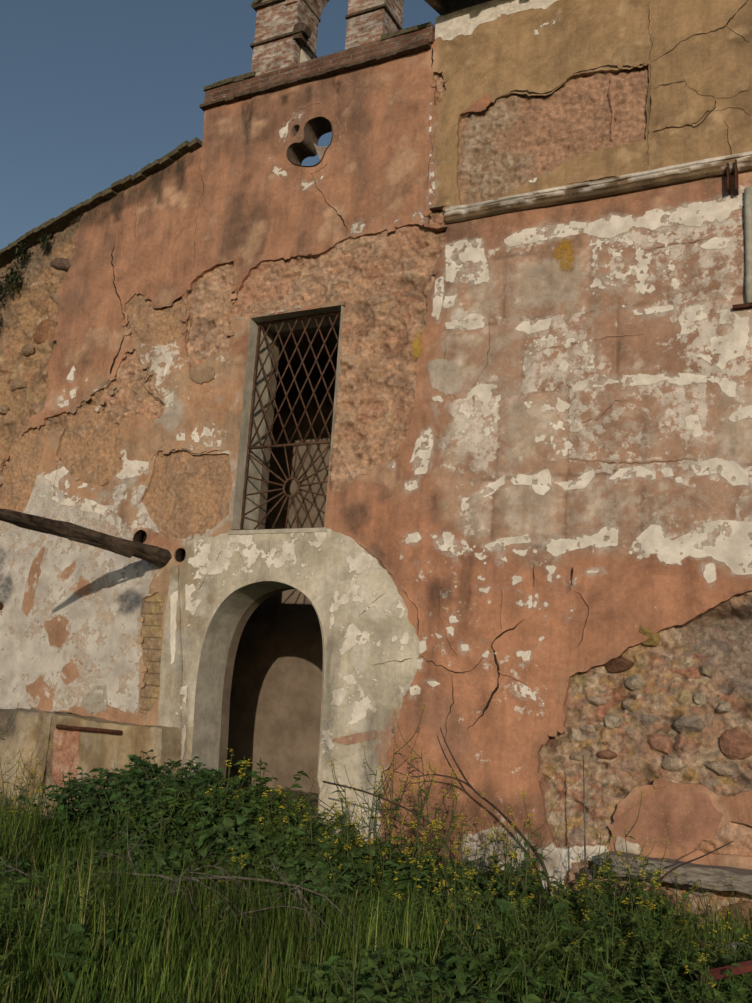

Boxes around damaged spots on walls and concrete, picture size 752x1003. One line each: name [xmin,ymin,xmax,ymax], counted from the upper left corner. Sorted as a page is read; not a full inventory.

crack [502,0,751,171]
crack [567,174,621,185]
crack [106,234,128,384]
peeling [504,191,750,397]
flaking render [0,60,651,725]
peeling [609,458,749,486]
peeling [729,405,752,422]
peeling [629,519,752,584]
peeling [176,685,188,762]
peeling [321,664,396,753]
crack [356,542,529,743]
flaking render [460,592,752,940]